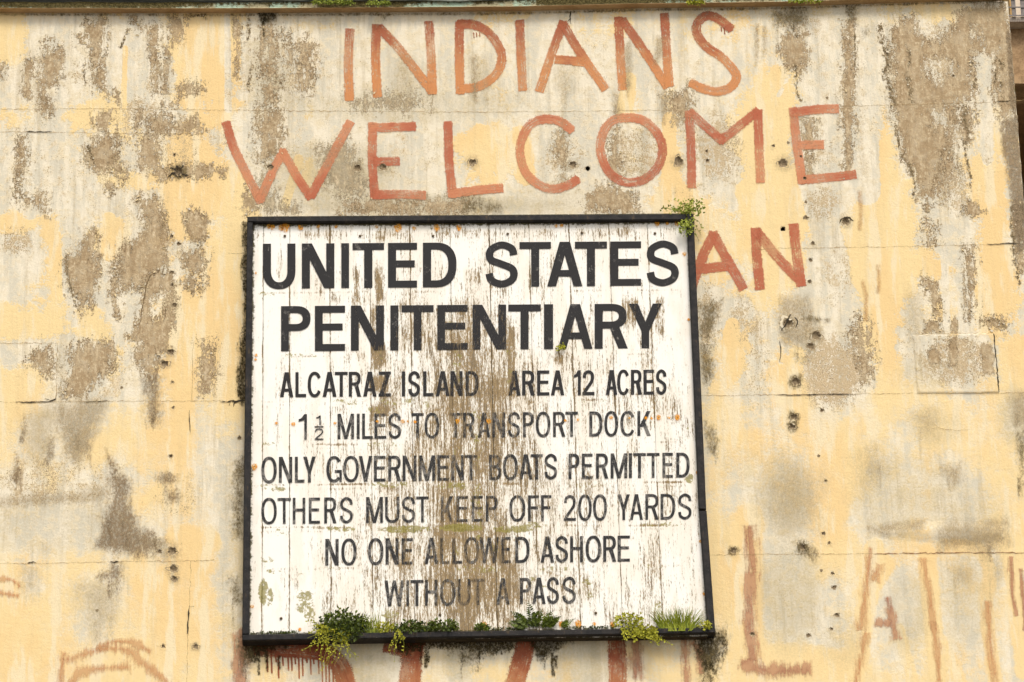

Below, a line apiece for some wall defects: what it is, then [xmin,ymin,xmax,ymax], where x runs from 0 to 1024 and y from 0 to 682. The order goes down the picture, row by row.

peeling [775,24,812,101]
water stain [1000,31,1024,253]
peeling [0,13,229,403]
spalling [788,373,804,389]
spalling [780,314,827,354]
peeling [843,308,882,393]
water stain [233,458,244,536]
water stain [694,630,728,682]